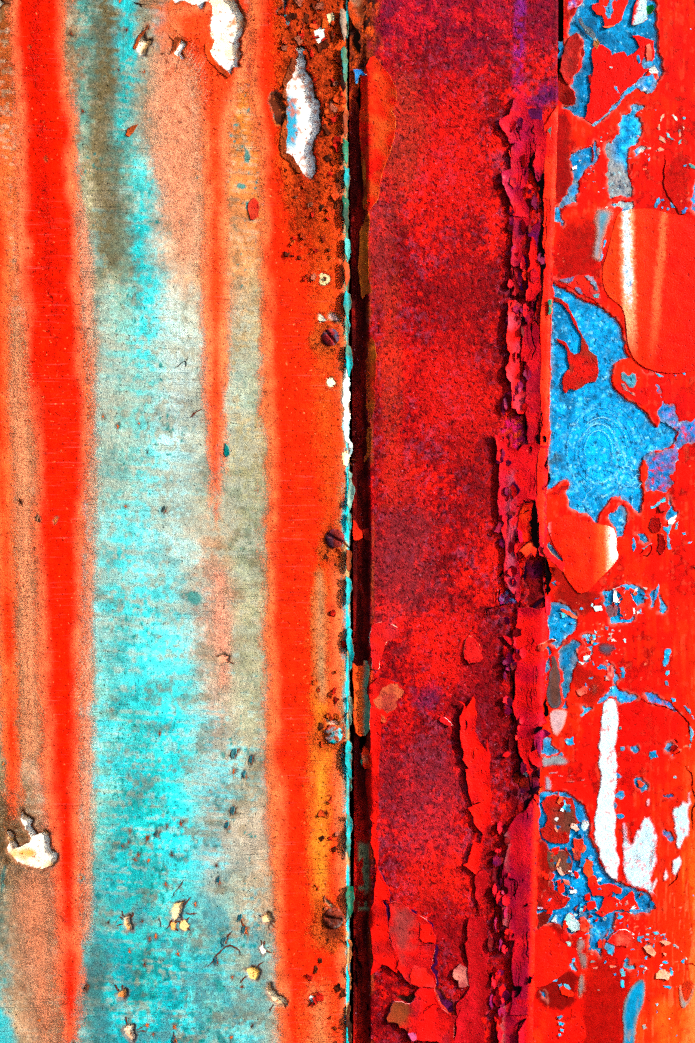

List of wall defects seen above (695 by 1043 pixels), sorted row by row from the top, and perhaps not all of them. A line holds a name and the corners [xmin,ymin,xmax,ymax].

peeling [173,0,245,78]
peeling [268,0,397,605]
rust [0,0,99,1043]
rust [144,0,346,1043]
peeling [345,0,695,1043]
peeling [334,626,354,674]
peeling [7,810,57,869]
peeling [319,813,353,858]
peeling [149,897,196,940]
peeling [124,1017,154,1040]
peeling [231,940,289,1012]
spalling [306,939,352,1043]